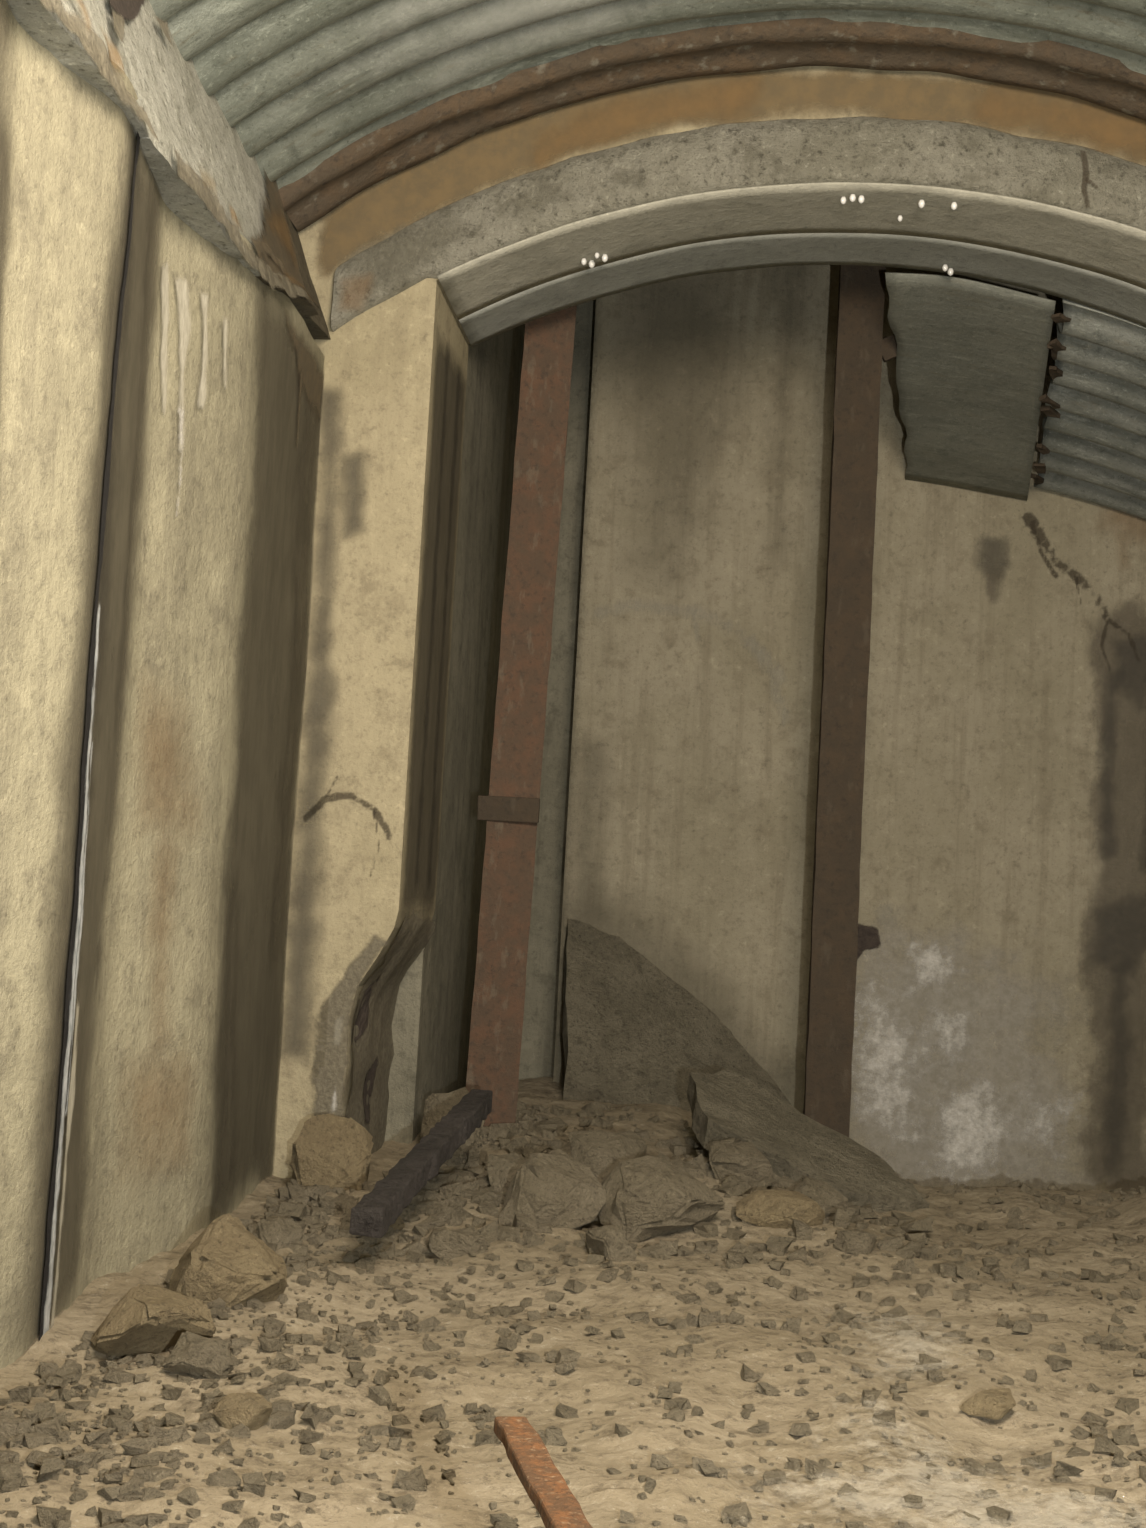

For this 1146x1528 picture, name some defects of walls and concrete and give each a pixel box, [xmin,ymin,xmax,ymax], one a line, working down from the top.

spalling [41,0,172,140]
rust [320,71,1146,274]
crack [1023,513,1137,658]
water stain [909,943,954,992]
water stain [1083,604,1146,1190]
water stain [854,984,1069,1182]